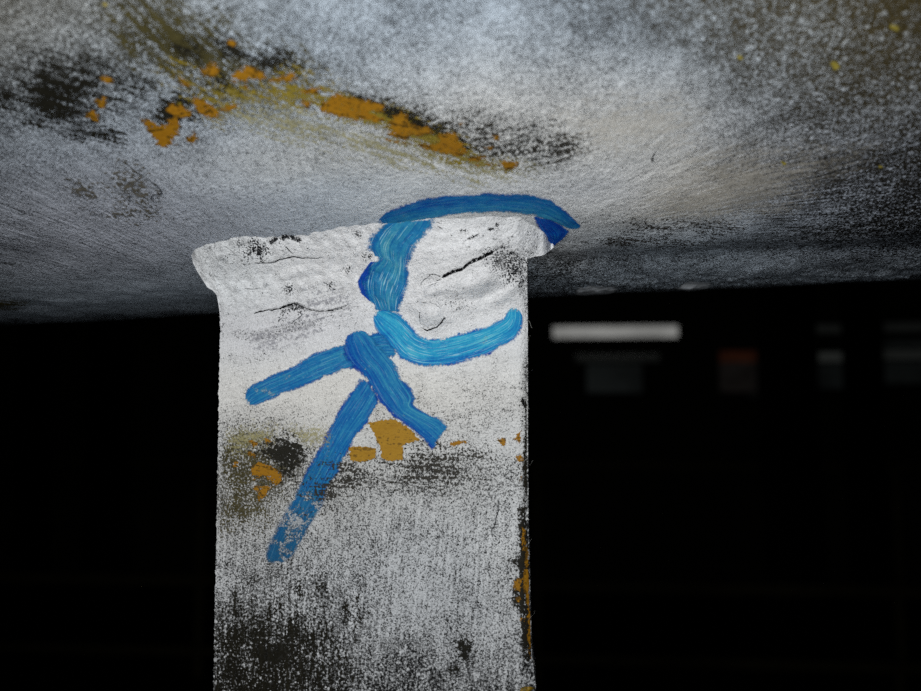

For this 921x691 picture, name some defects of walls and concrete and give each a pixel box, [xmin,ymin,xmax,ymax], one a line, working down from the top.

damp [0,72,41,116]
damp [51,107,127,151]
crack [258,246,323,264]
crack [419,251,494,331]
crack [254,303,351,324]
damp [267,562,359,657]